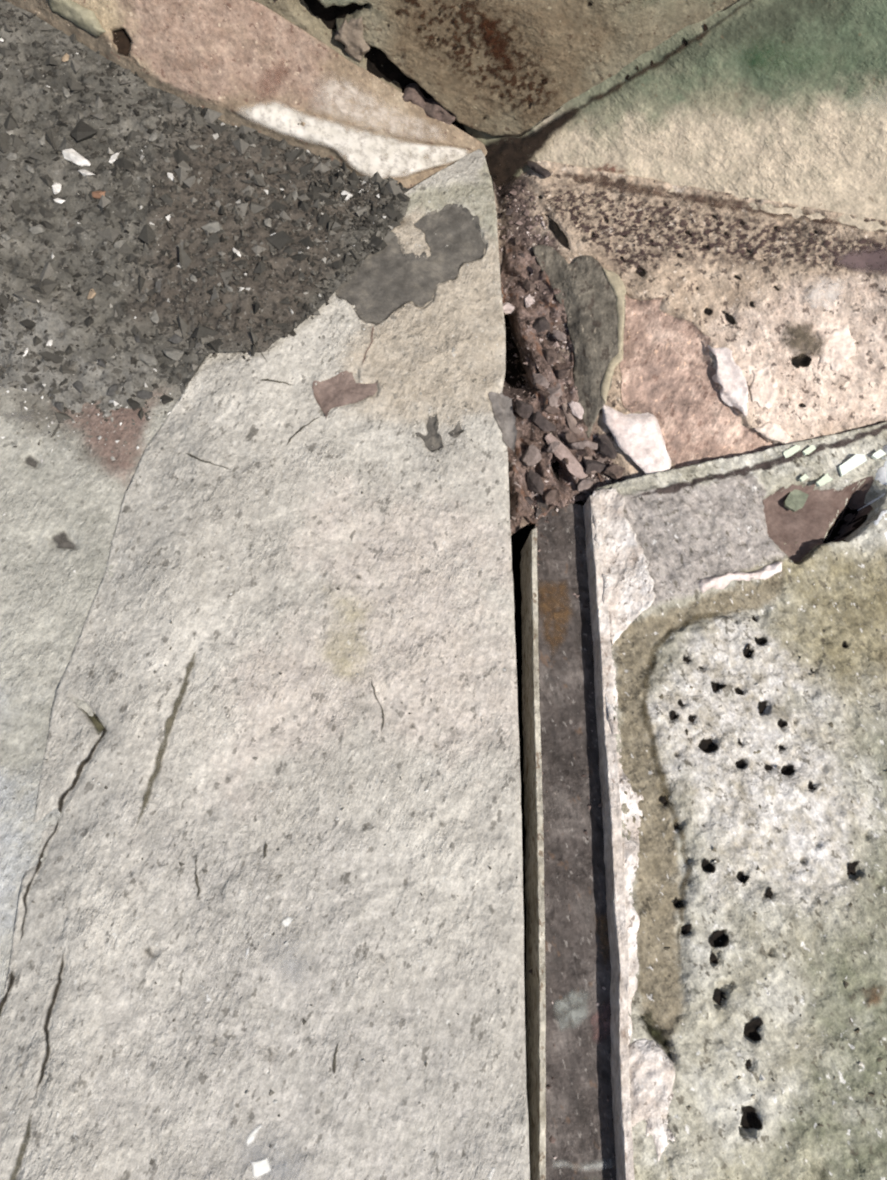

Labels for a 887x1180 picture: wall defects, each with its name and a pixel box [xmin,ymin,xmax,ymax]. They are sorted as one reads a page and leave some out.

crack [304,0,433,98]
corrosion [398,0,556,110]
crack [519,0,751,136]
crack [452,118,471,136]
crack [139,653,195,818]
crack [21,709,107,939]
crack [0,972,14,1014]
crack [37,958,64,1087]
crack [10,1121,30,1180]